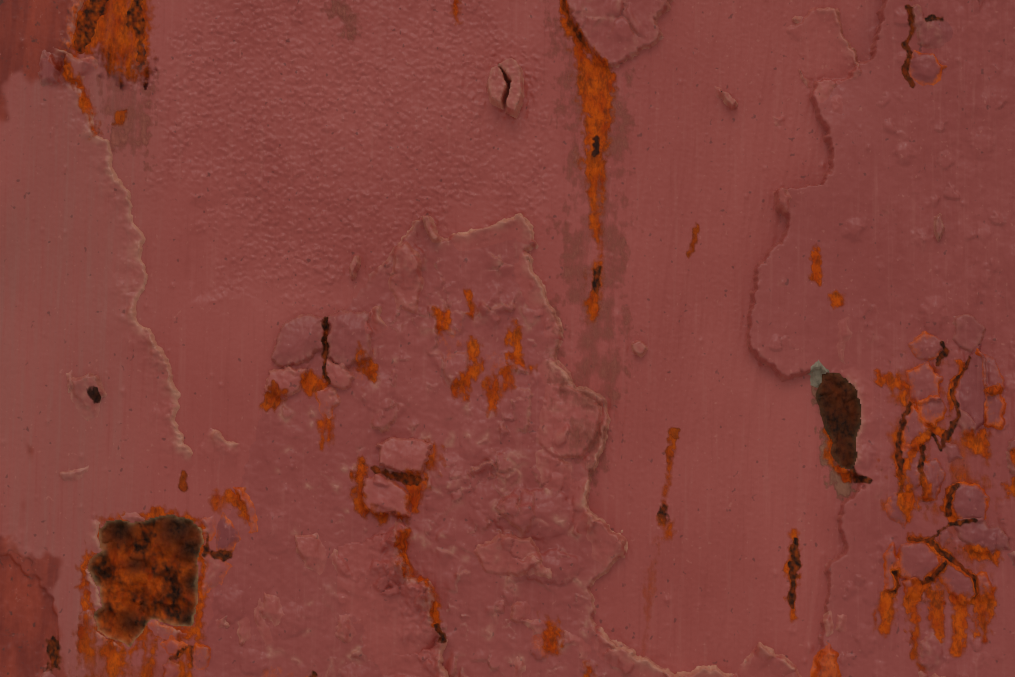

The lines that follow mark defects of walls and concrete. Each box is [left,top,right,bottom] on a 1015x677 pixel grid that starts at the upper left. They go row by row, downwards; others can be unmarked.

peeling [38,48,98,86]
corrosion [49,0,152,82]
peeling [486,58,525,119]
peeling [559,0,673,74]
corrosion [548,18,634,407]
peeling [746,0,1015,677]
peeling [88,213,734,677]
corrosion [823,429,852,483]
corrosion [76,506,207,677]
spalling [40,636,61,677]